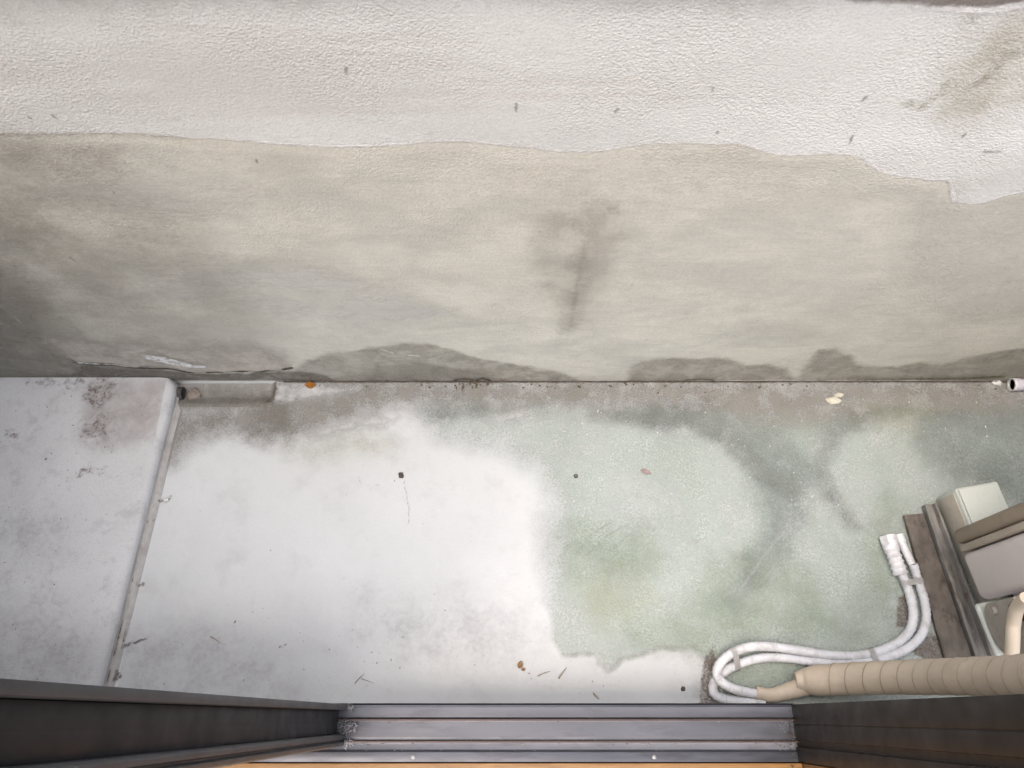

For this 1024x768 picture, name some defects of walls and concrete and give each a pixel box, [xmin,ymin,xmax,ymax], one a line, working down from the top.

peeling [44,336,334,381]
damp [0,133,1024,552]